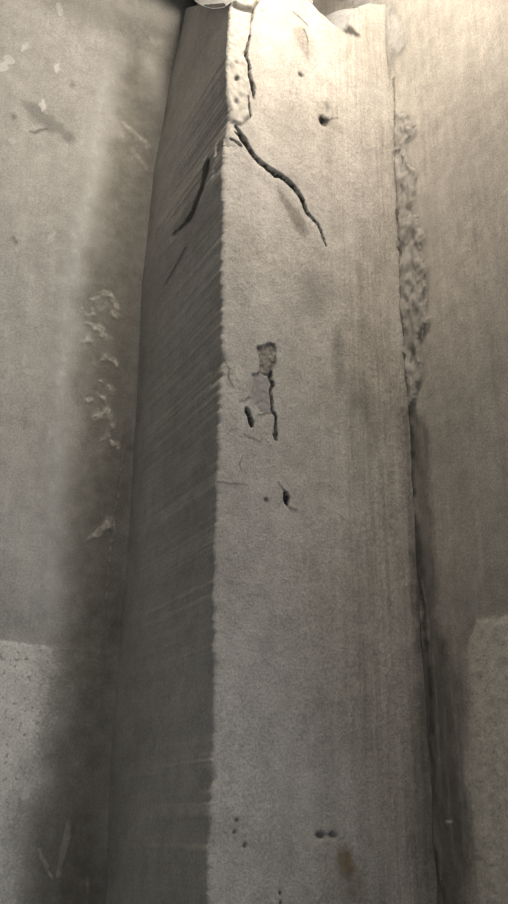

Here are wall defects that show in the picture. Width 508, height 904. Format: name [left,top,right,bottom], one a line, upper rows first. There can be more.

crack [165,11,322,283]
damp [83,287,125,342]
damp [86,336,129,583]
peeling [245,343,278,441]